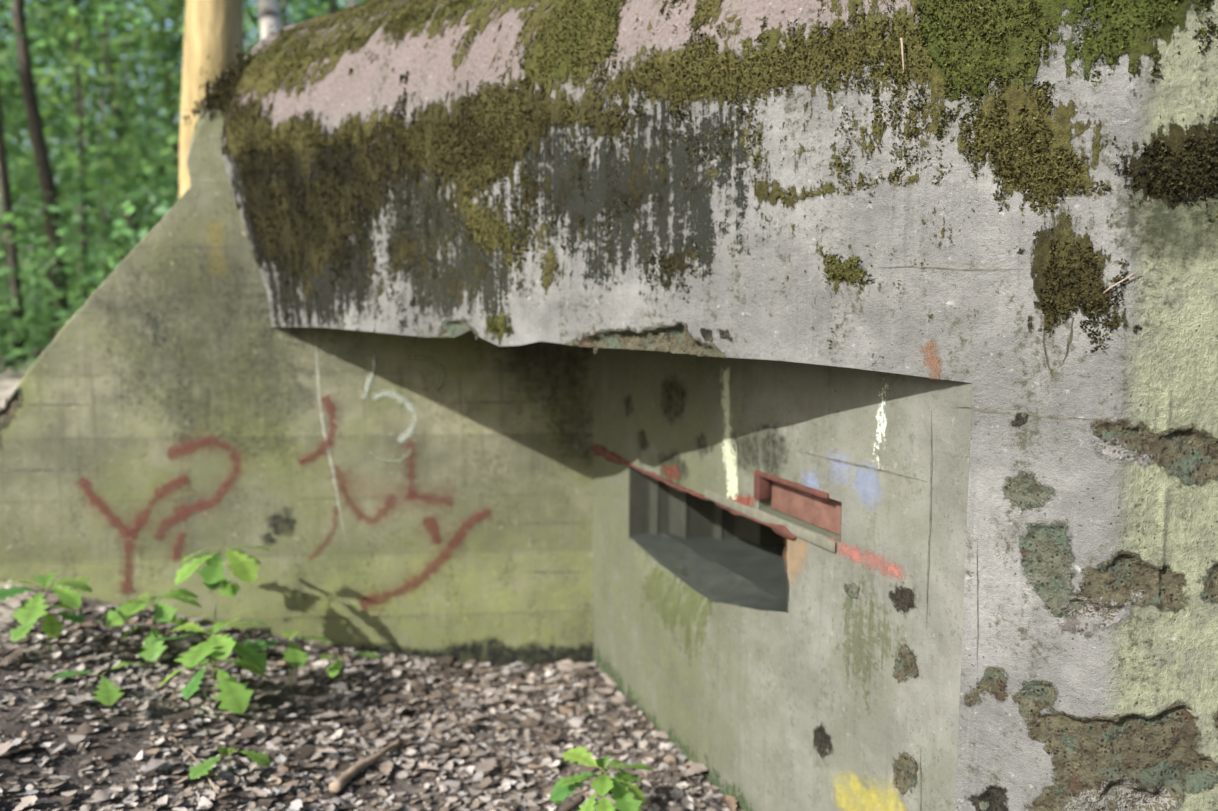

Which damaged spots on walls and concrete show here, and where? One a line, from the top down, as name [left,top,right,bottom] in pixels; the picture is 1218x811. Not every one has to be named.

leakage [222,75,773,328]
spalling [566,321,733,358]
spalling [0,387,23,429]
spalling [1090,419,1218,486]
spalling [1003,471,1218,638]
spalling [889,586,914,613]
leakage [356,639,594,667]
spalling [893,644,919,683]
spalling [813,723,833,758]
spalling [964,667,1218,811]
spalling [893,752,918,794]